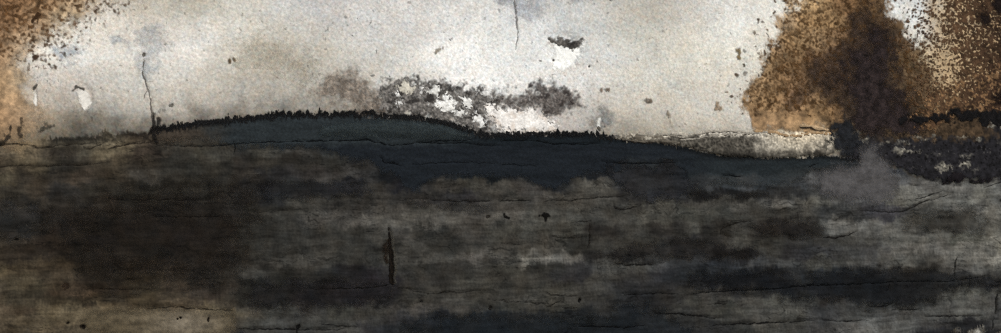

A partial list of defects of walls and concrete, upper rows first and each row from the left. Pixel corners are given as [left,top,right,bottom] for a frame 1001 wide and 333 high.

rust [0,0,130,148]
crack [142,61,153,116]
rust [730,0,1001,140]
crack [0,138,595,167]
leakage [151,70,1001,214]
leakage [752,218,825,240]
leakage [903,209,989,238]
leakage [248,276,394,315]
leakage [400,300,694,333]
crack [313,227,1001,329]
leakage [607,237,1001,312]